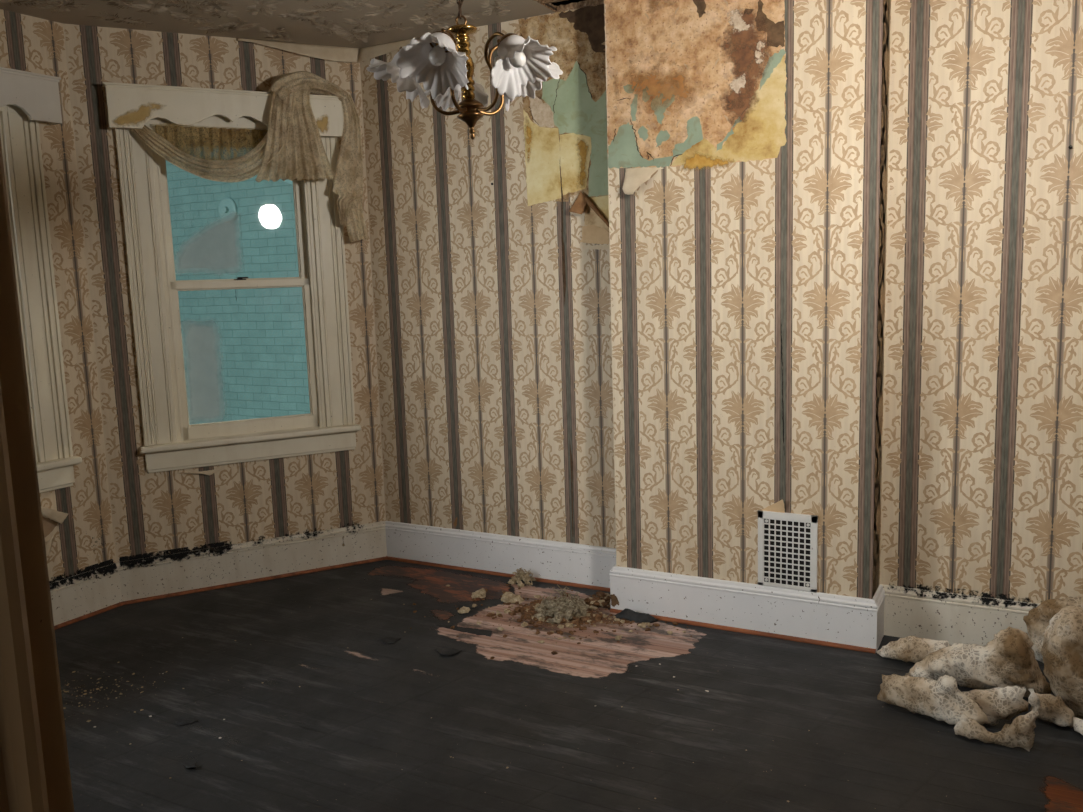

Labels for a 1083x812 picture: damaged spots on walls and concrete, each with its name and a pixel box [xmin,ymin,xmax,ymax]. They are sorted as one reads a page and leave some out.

flaking render [534,0,605,52]
flaking render [693,0,706,18]
flaking render [728,0,786,93]
peeling [623,84,703,157]
damp [251,522,364,546]
damp [49,533,239,590]
damp [888,584,1042,609]